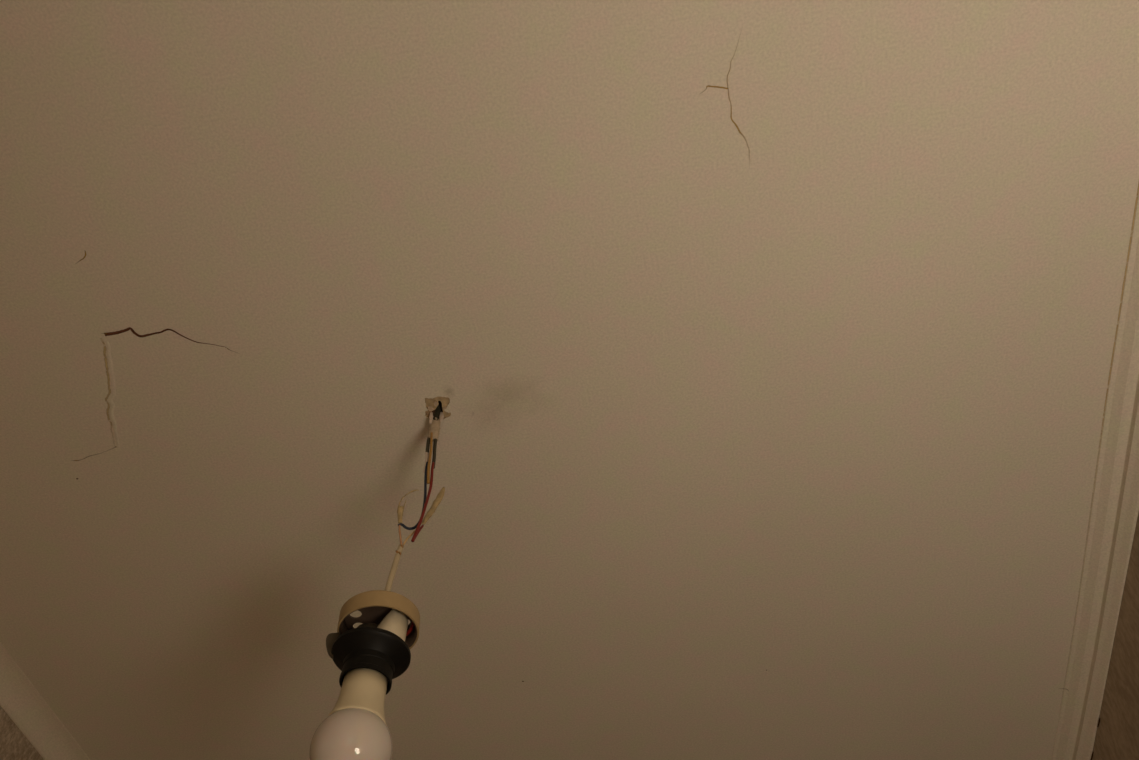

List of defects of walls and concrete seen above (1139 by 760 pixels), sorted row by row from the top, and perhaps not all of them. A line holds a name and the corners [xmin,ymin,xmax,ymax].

crack [706,70,742,134]
crack [104,327,230,350]